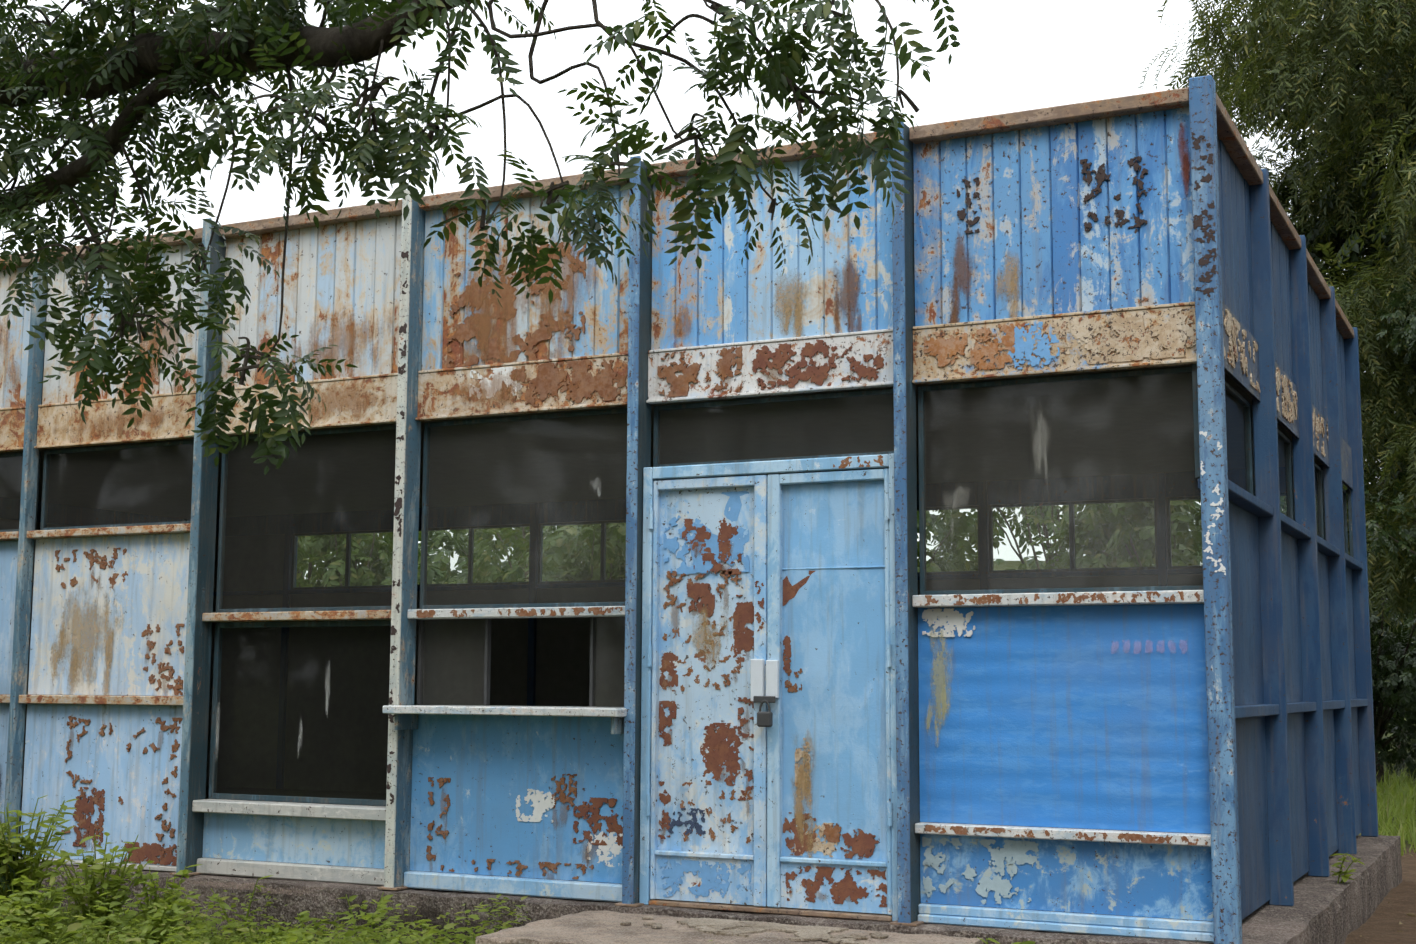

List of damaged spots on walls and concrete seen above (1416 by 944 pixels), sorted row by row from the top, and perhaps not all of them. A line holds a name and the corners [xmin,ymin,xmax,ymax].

peeling [1191,132,1216,298]
peeling [1223,309,1329,457]
peeling [1200,461,1226,575]
peeling [783,570,815,606]
rust [52,598,113,706]
peeling [658,491,764,844]
water stain [927,636,949,741]
peeling [471,774,623,880]
rust [794,745,813,858]
peeling [783,812,887,907]
peeling [922,825,1050,904]
spalling [620,916,889,944]